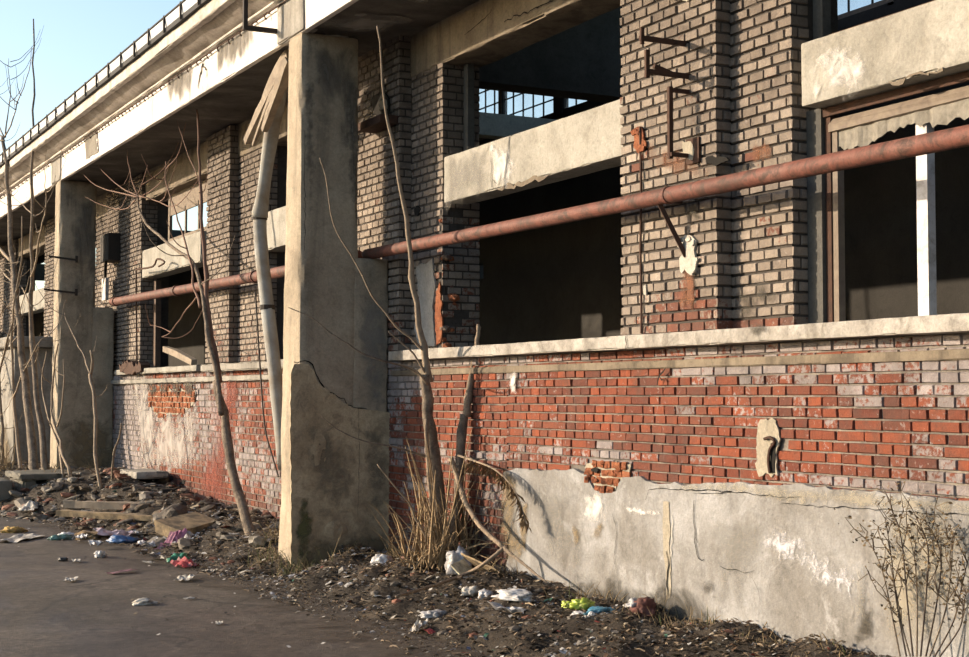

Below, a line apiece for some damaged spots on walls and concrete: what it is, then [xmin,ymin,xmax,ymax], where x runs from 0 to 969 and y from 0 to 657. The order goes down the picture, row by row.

crack [465,0,553,35]
spalling [119,360,150,375]
spalling [147,383,197,418]
damp [135,374,193,465]
crack [294,360,366,503]
spalling [584,460,632,493]
crack [646,488,964,599]